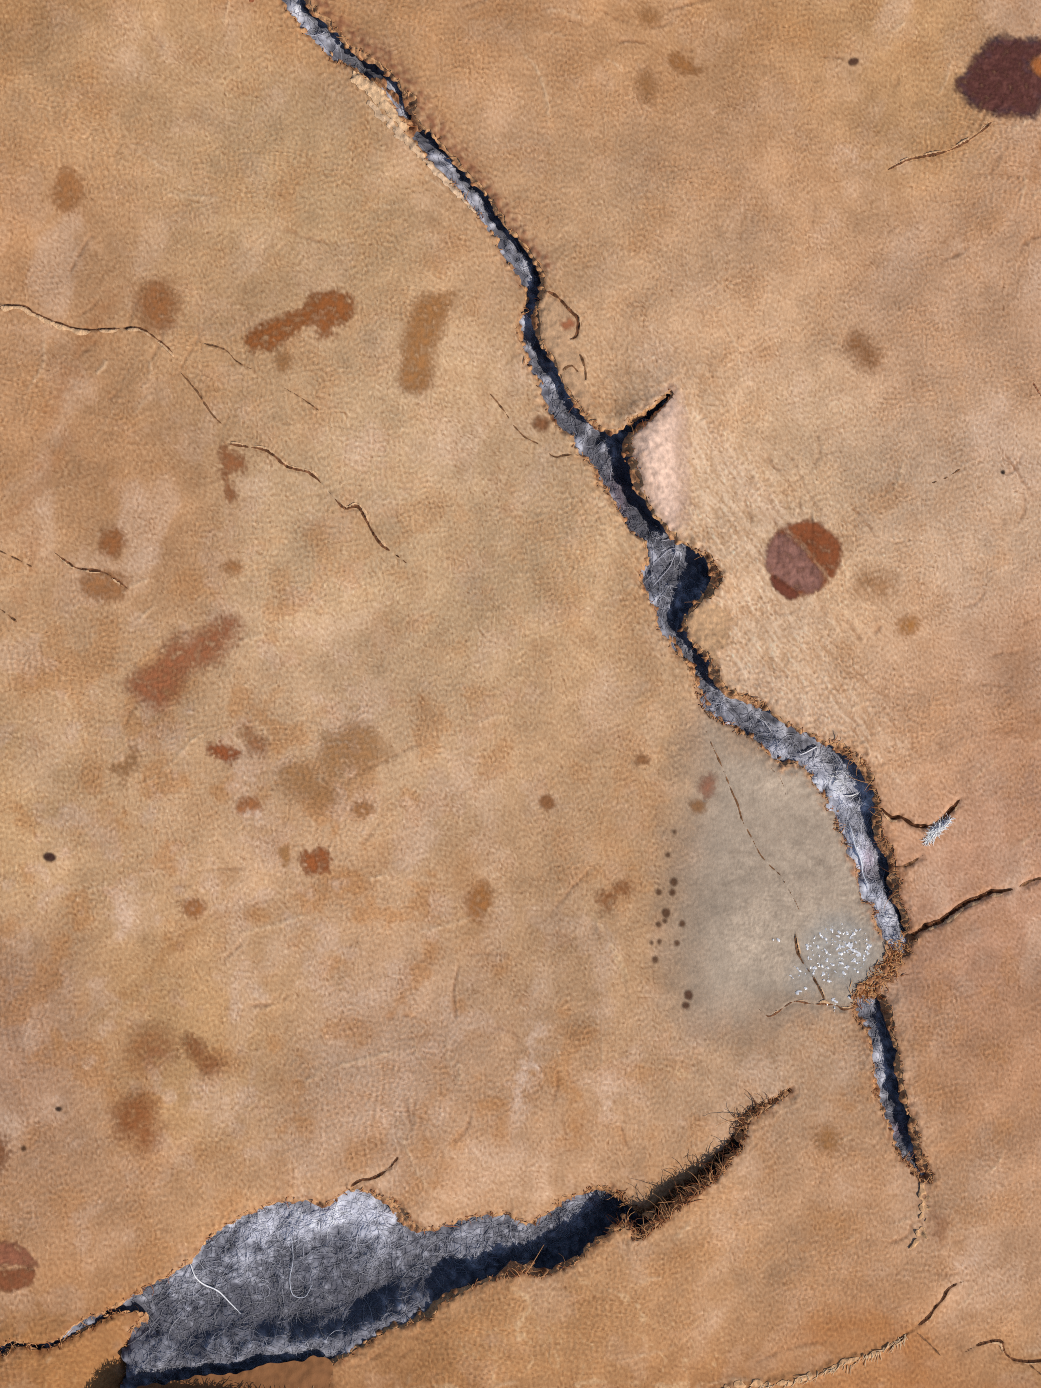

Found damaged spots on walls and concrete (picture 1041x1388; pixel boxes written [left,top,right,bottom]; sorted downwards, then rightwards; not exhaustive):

crack [889,116,997,170]
corrosion [245,291,353,352]
crack [546,291,587,380]
crack [1,304,407,563]
crack [490,394,579,458]
damp [691,777,714,811]
crack [701,696,853,1017]
crack [881,800,960,868]
damp [651,879,685,962]
crack [911,877,1041,936]
crack [351,1157,398,1187]
crack [724,1281,1041,1388]